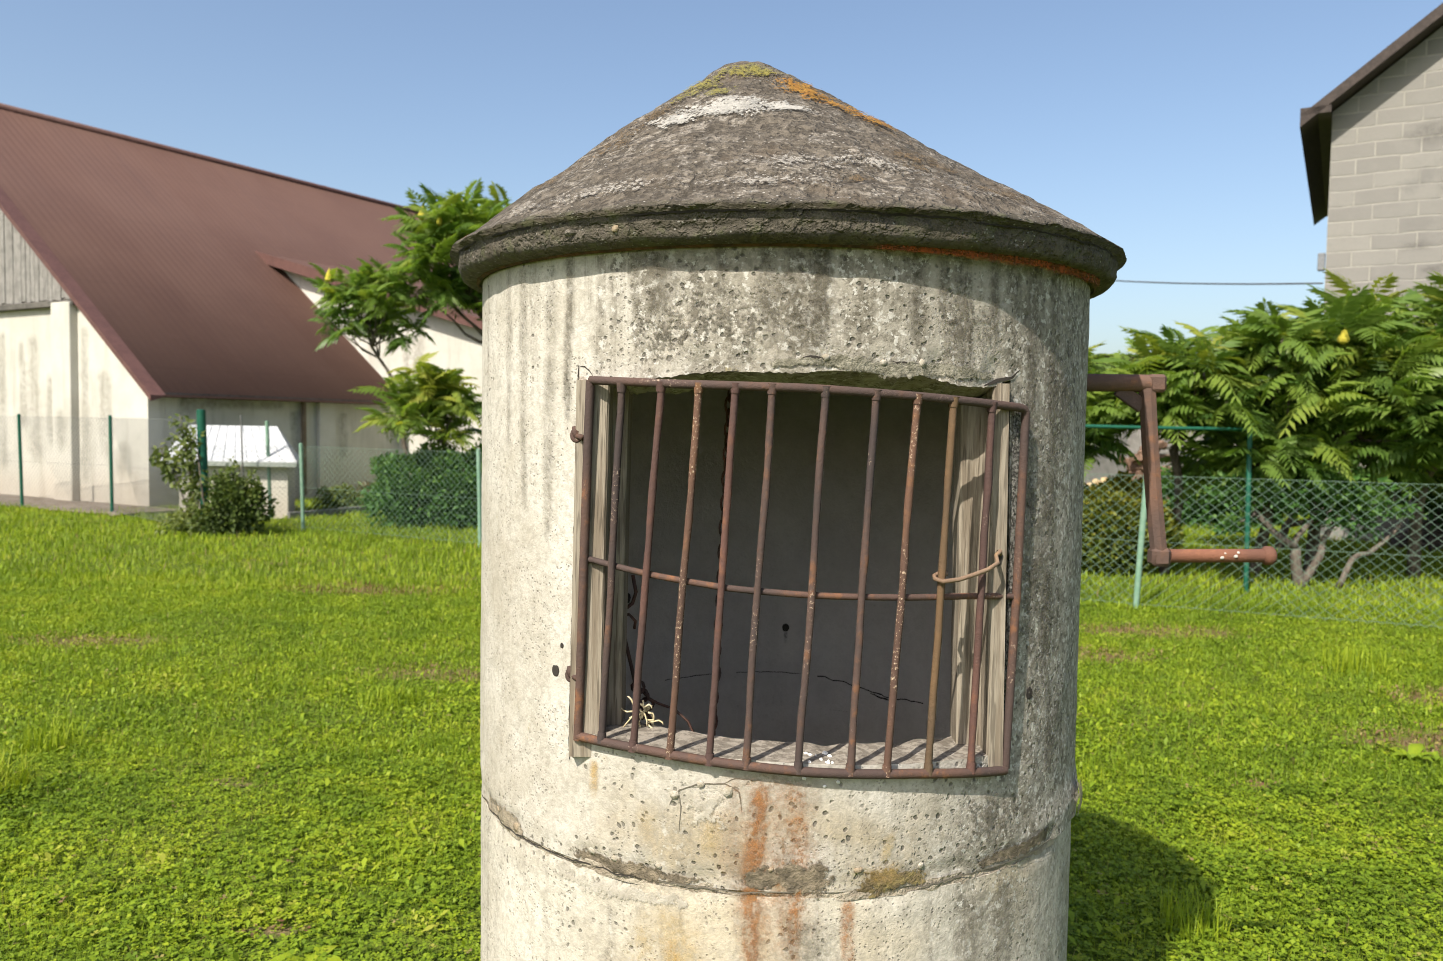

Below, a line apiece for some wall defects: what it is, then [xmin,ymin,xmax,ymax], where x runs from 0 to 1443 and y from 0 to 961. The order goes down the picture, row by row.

leakage [783,251,828,340]
corrosion [881,244,1100,286]
leakage [1016,270,1057,508]
corrosion [744,792,764,961]